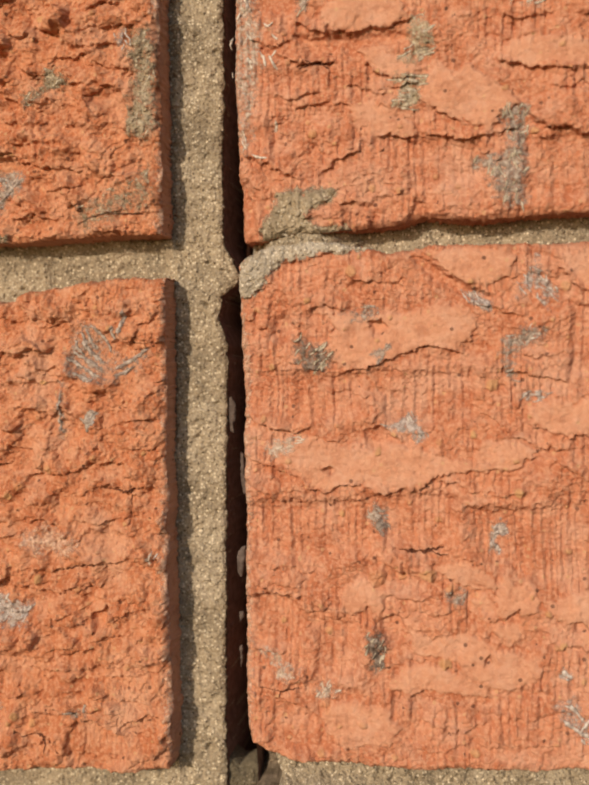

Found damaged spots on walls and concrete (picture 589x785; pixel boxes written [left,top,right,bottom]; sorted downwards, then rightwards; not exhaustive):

crack [219,0,298,785]